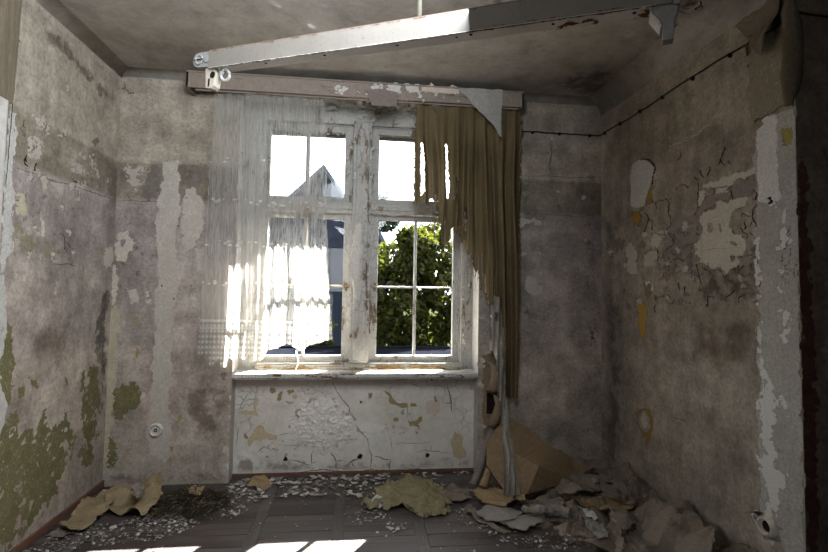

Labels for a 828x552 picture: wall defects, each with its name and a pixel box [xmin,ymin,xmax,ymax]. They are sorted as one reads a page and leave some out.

peeling [316,82,444,138]
flaking render [0,111,110,359]
flaking render [0,376,15,434]
flaking render [103,261,140,467]
flaking render [128,160,186,462]
peeling [229,396,298,465]
peeling [269,387,298,404]
crack [258,379,448,472]
peeling [382,391,422,434]
flaking render [623,106,806,552]
flaking render [23,472,448,552]